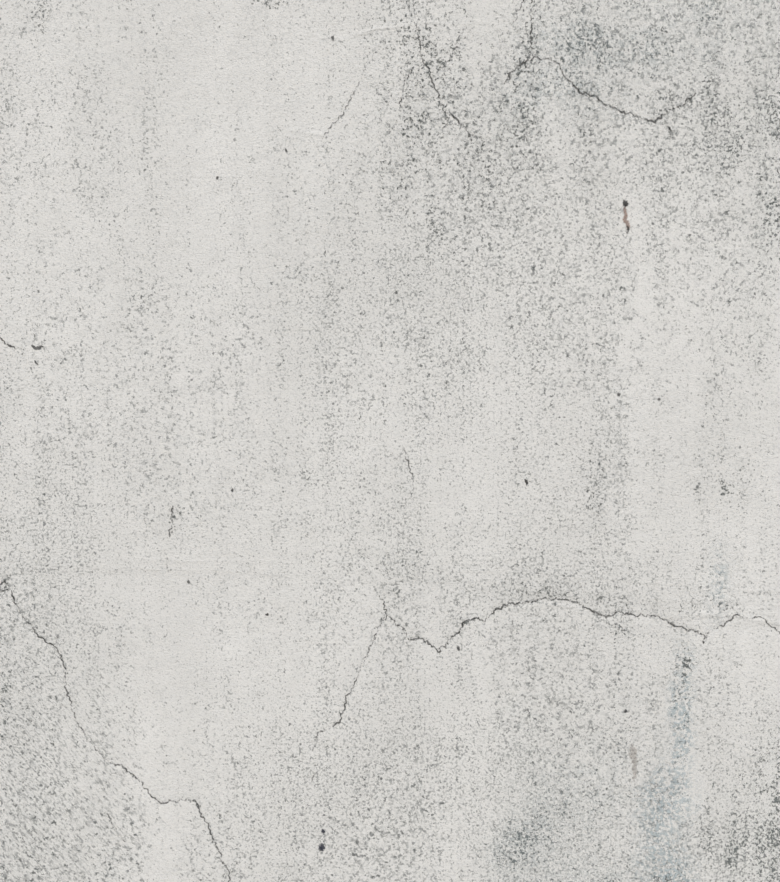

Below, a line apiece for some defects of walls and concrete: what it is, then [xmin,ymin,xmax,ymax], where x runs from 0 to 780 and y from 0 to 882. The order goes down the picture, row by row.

crack [504,0,696,123]
crack [0,580,231,882]
crack [314,596,780,747]